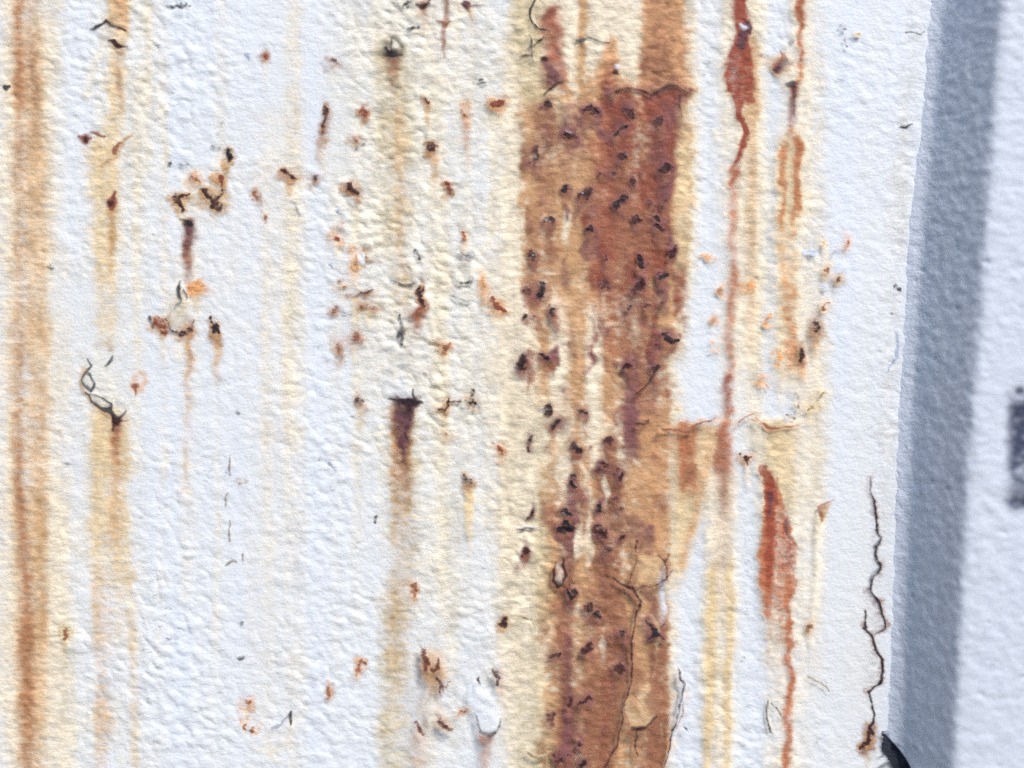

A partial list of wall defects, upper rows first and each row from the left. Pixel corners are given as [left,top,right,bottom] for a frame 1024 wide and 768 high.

corrosion [0,0,74,768]
corrosion [171,148,234,306]
corrosion [209,316,222,364]
corrosion [389,390,423,485]
corrosion [480,0,831,768]
corrosion [383,645,404,692]
crack [604,540,686,768]
crack [863,478,886,735]